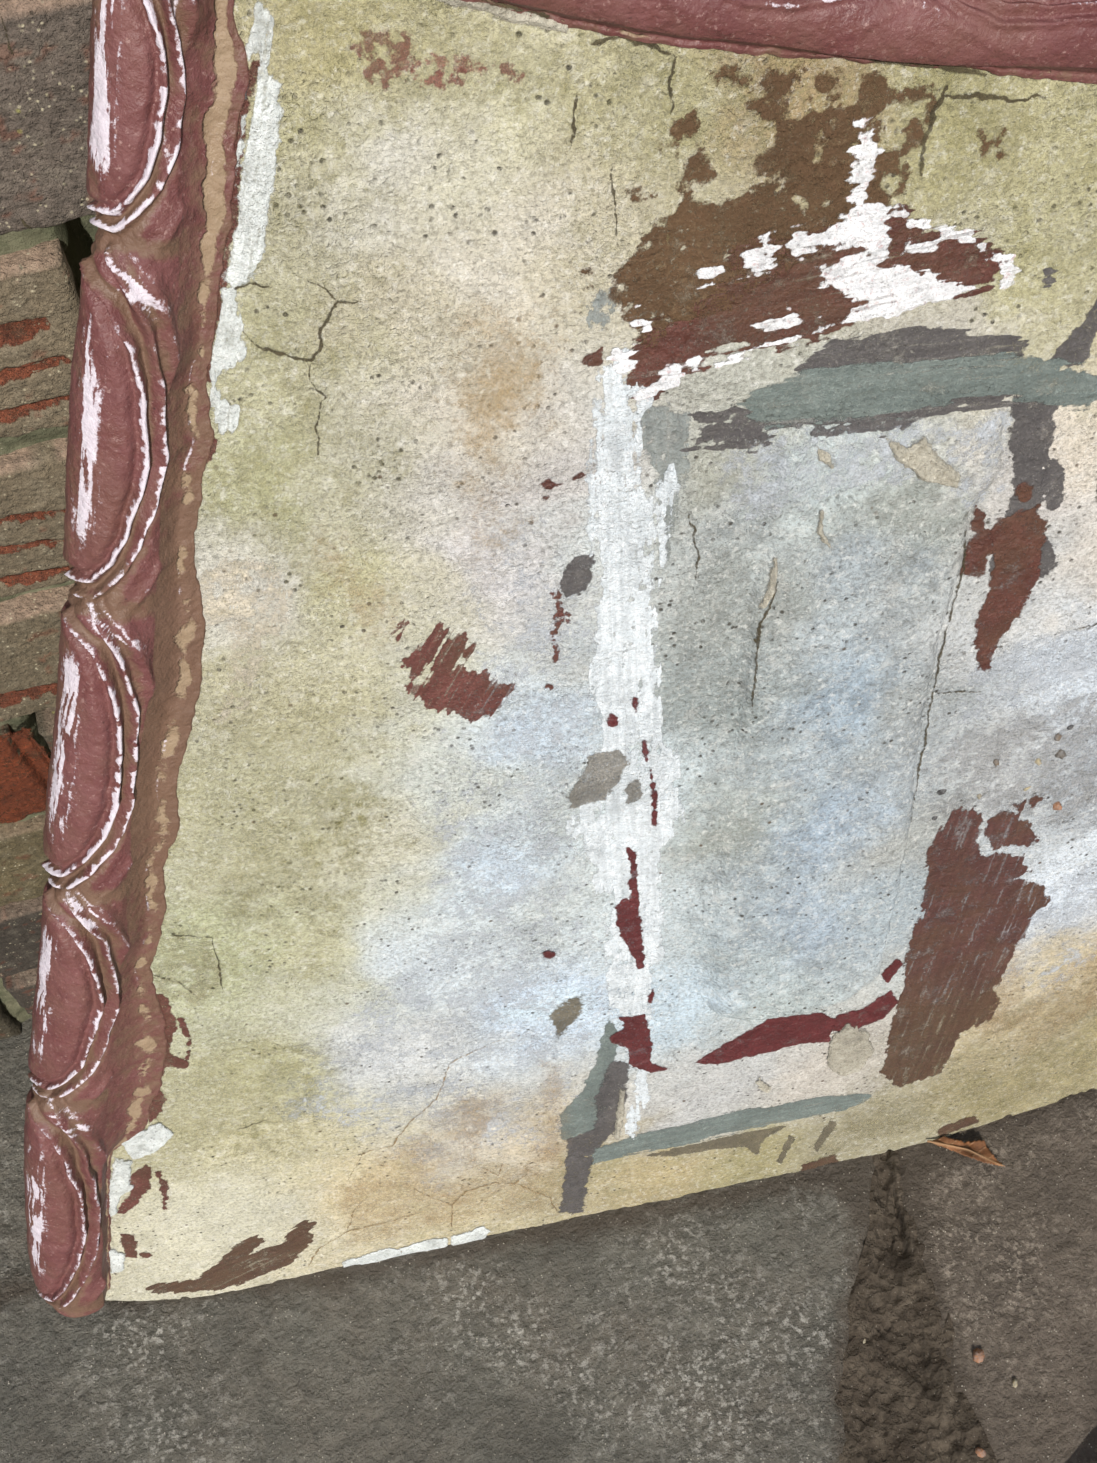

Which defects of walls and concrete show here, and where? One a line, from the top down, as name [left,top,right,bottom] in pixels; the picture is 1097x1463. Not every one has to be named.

peeling [209,2,284,435]
crack [234,282,268,290]
crack [243,281,361,455]